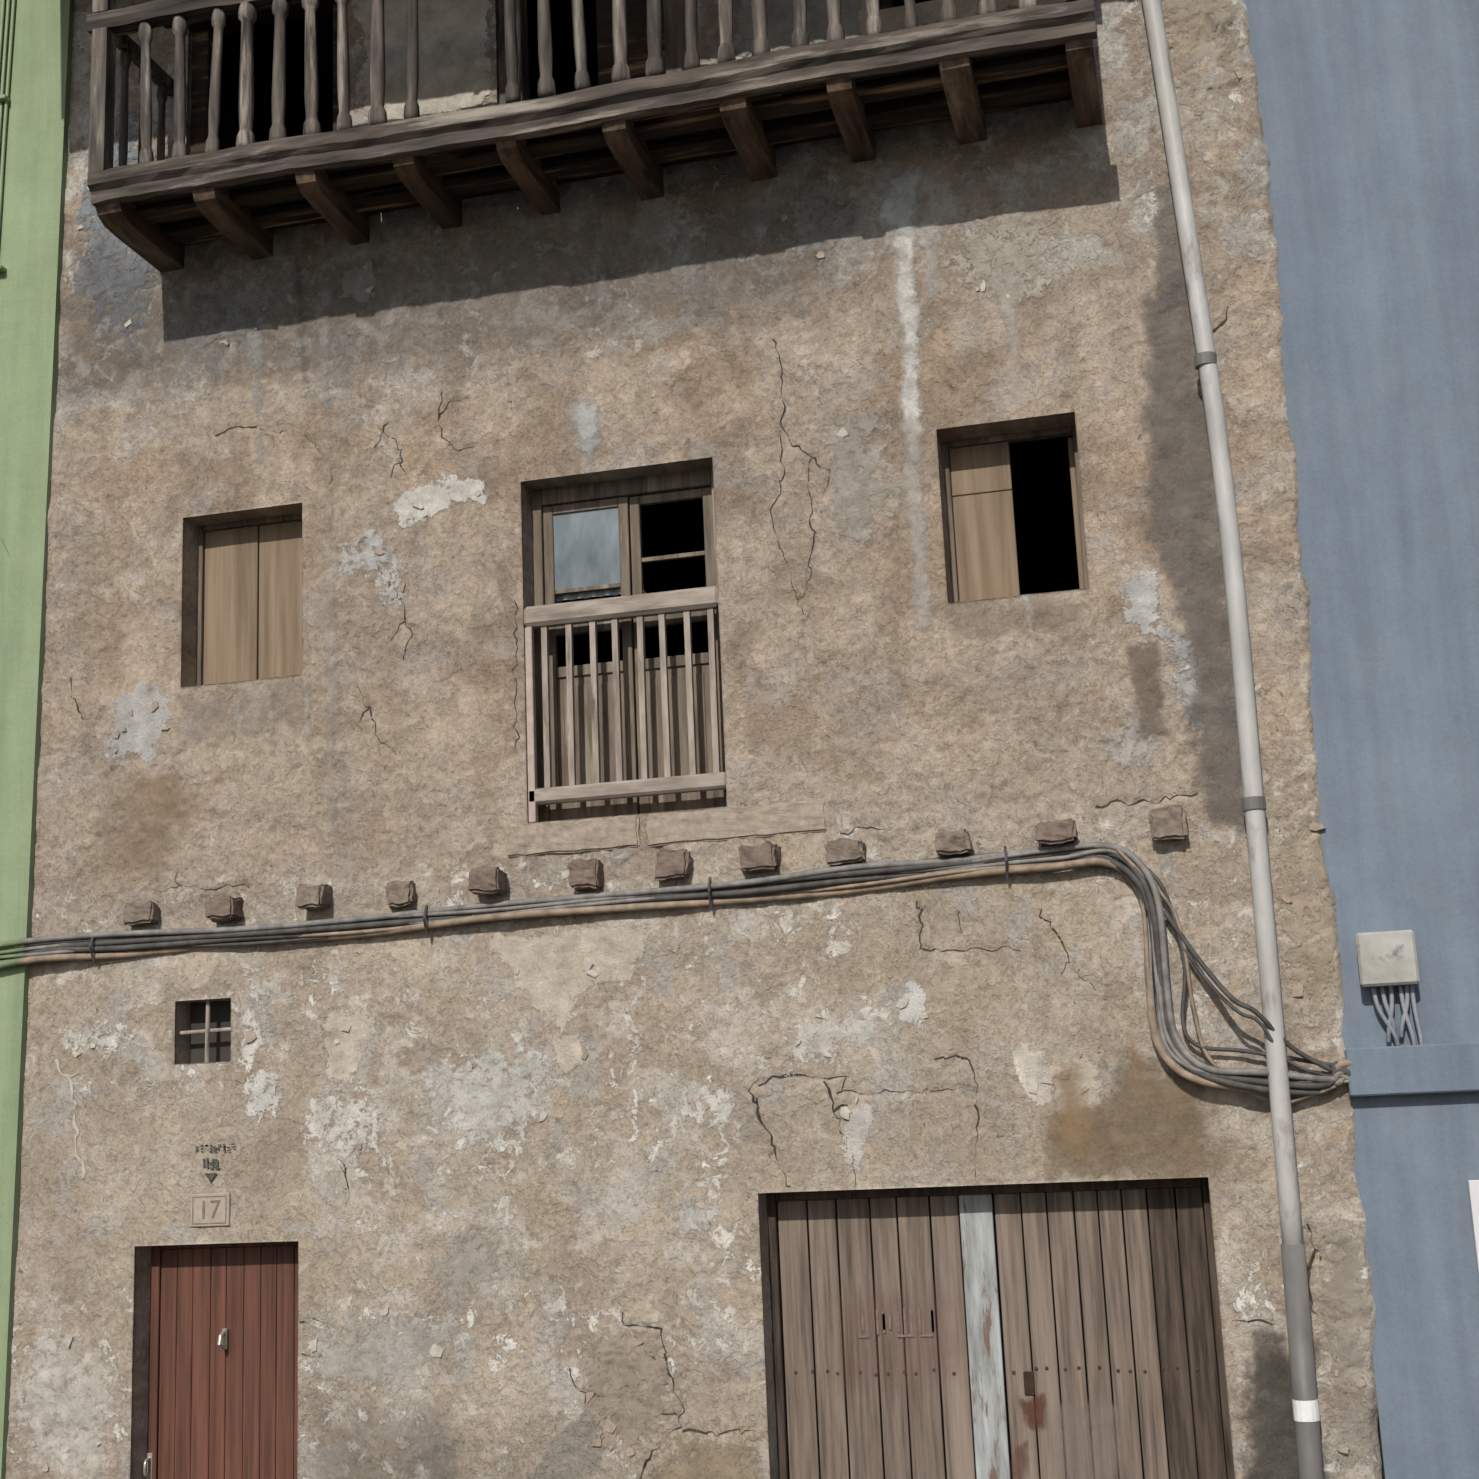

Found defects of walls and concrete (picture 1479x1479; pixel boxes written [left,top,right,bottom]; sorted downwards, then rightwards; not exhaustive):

leakage [880,166,930,626]
crack [770,339,831,615]
crack [374,556,413,660]
peeling [331,472,488,616]
crack [356,686,396,754]
crack [916,901,1021,952]
crack [1039,909,1096,990]
crack [748,1055,980,1187]
crack [569,1312,758,1479]